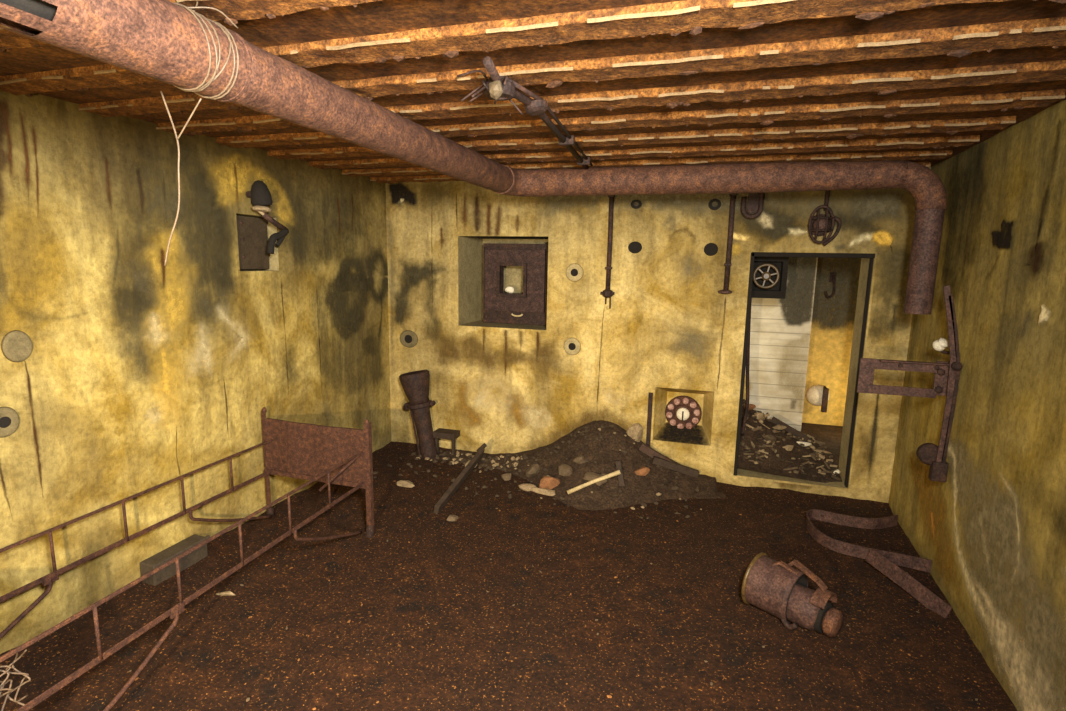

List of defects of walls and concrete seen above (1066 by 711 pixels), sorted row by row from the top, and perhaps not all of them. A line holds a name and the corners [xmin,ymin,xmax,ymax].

damp [733,0,794,8]
damp [587,6,700,23]
damp [486,21,558,33]
damp [326,38,411,50]
damp [292,198,553,390]
damp [460,385,480,425]
damp [510,398,525,425]